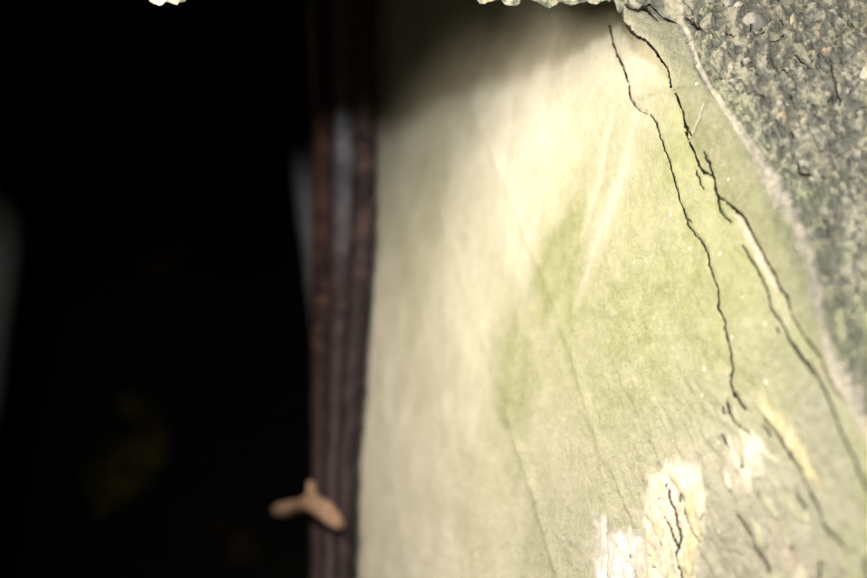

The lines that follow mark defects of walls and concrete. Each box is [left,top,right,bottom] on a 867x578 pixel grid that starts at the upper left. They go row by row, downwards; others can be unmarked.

crack [608,3,867,549]
peeling [722,427,779,491]
damp [593,512,648,578]
peeling [641,458,708,578]
crack [664,483,701,578]
crack [737,514,771,573]
peeling [751,493,810,578]